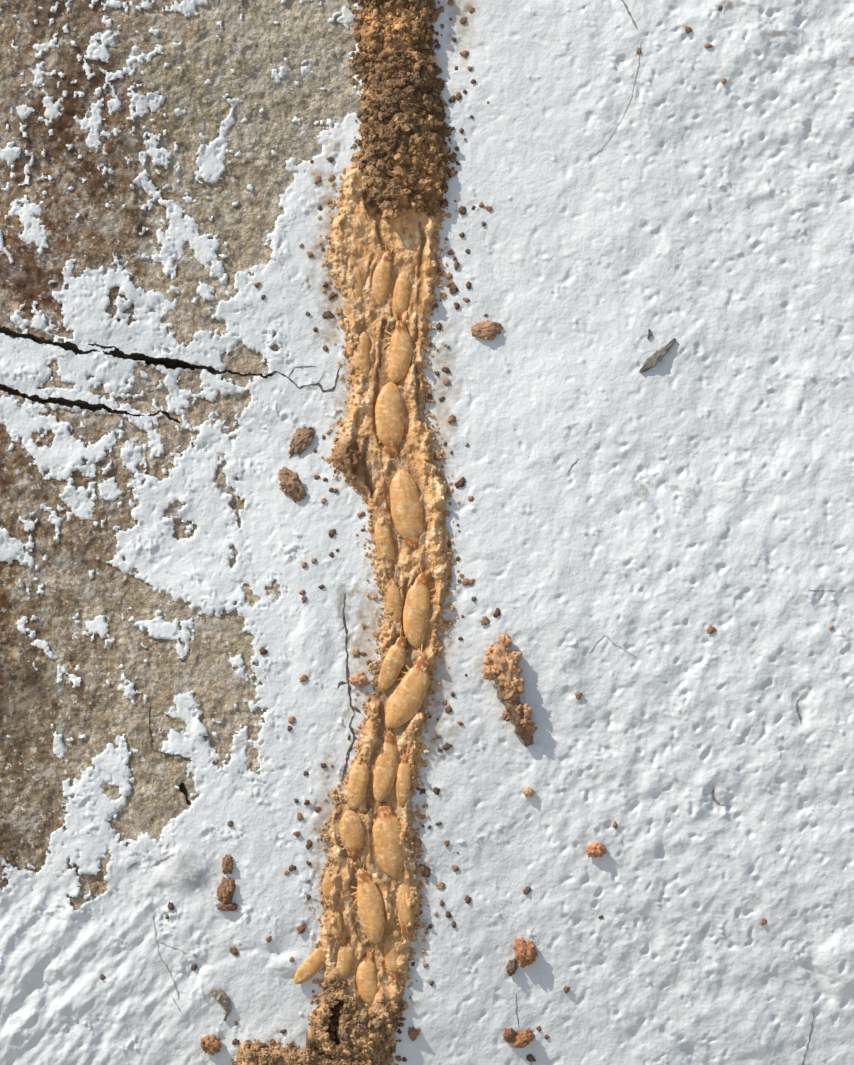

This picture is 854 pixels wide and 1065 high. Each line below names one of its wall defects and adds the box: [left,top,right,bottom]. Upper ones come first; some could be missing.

peeling [0,0,363,353]
crack [0,384,181,424]
crack [0,326,340,392]
peeling [0,332,281,910]